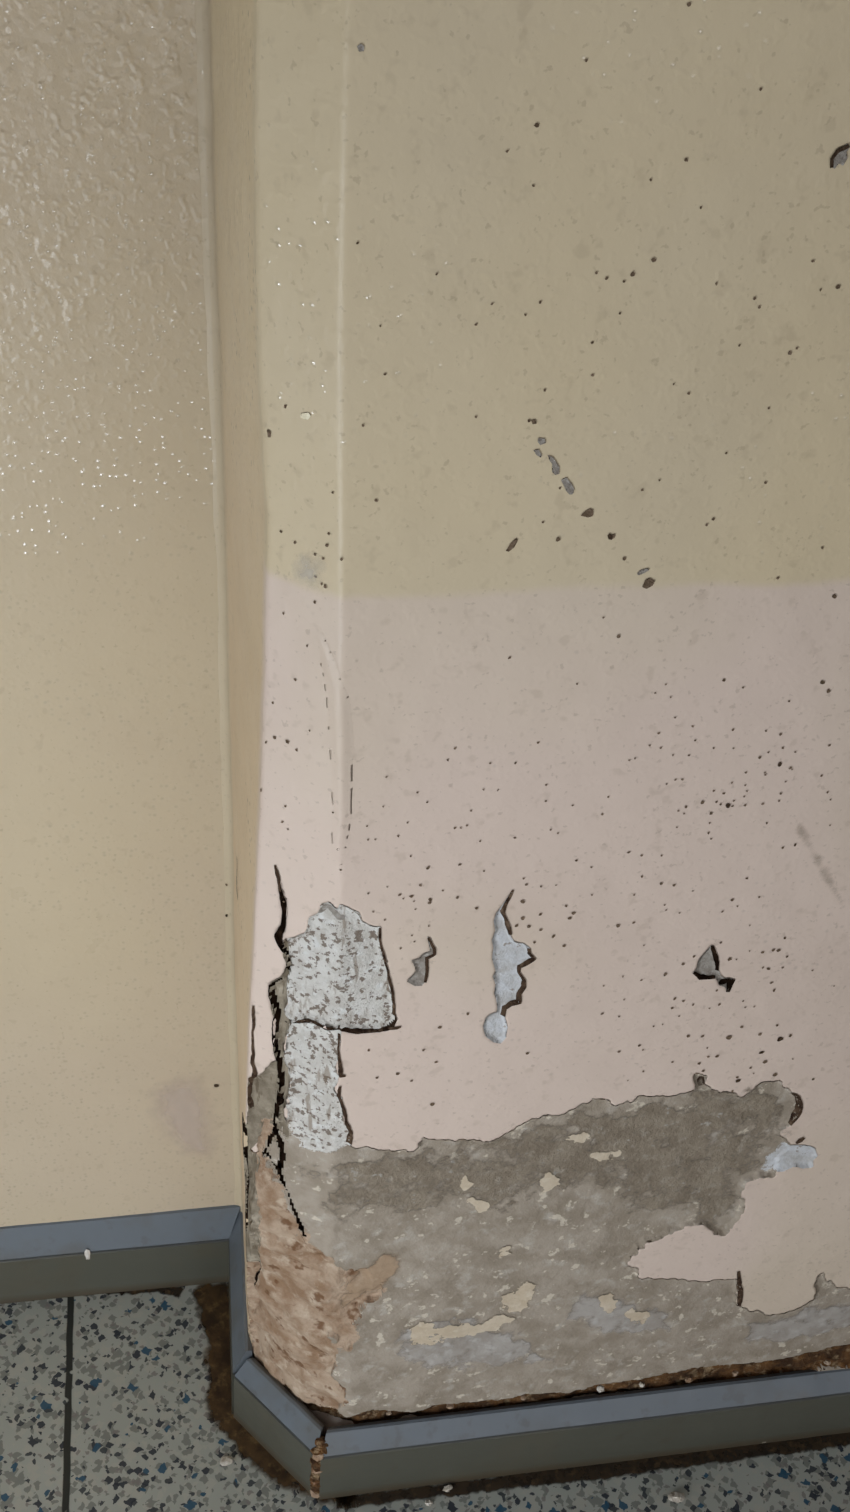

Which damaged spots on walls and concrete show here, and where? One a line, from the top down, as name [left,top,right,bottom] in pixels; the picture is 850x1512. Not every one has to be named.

crack [242,865,401,1285]
flaking render [242,890,850,1418]